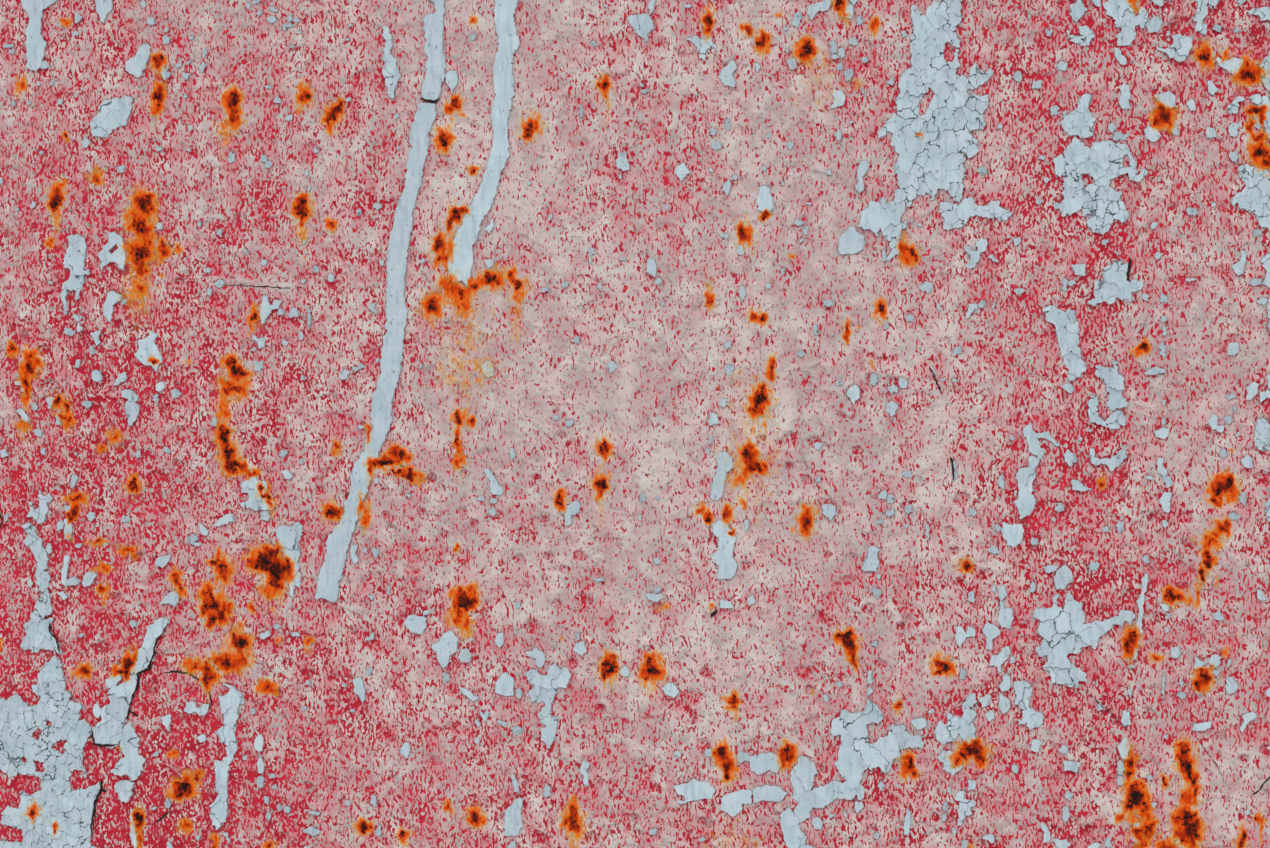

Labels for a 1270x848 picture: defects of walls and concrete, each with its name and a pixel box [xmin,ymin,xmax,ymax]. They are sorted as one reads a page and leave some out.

peeling [315,0,459,602]
corrosion [421,205,528,388]
peeling [838,0,1012,261]
peeling [1035,94,1168,375]
peeling [1206,50,1270,237]
corrosion [215,353,277,517]
corrosion [695,354,776,536]
peeling [0,490,179,848]
corrosion [168,543,295,692]
peeling [1033,555,1149,688]
corrosion [1161,471,1240,607]
corrosion [1115,738,1205,848]